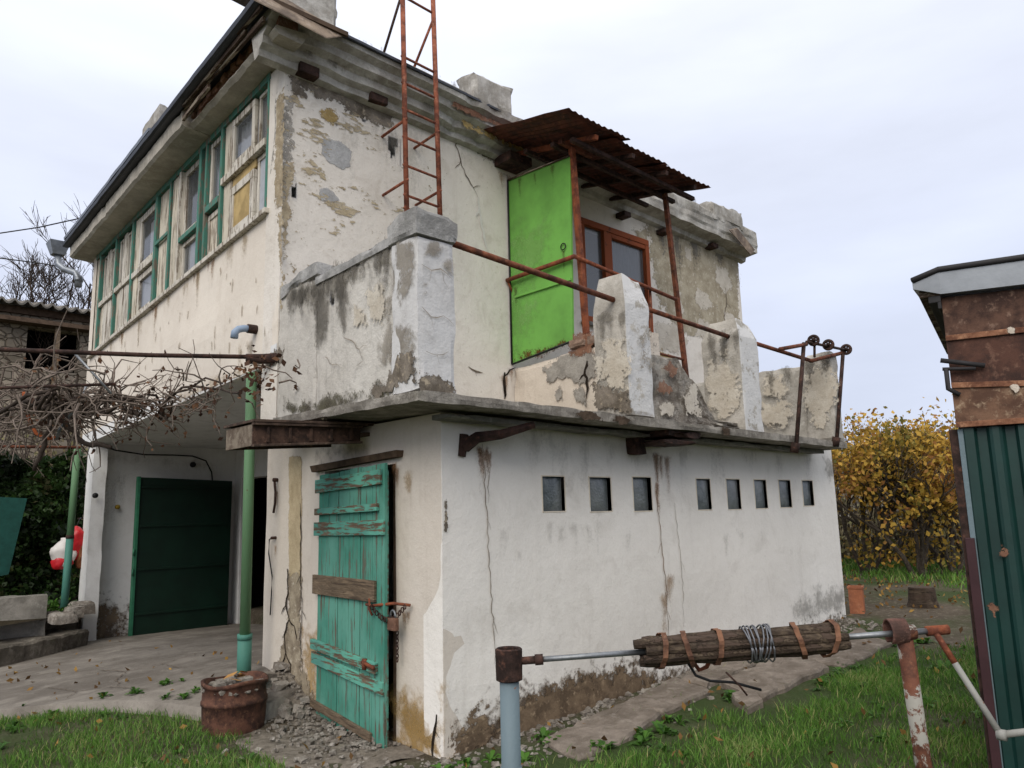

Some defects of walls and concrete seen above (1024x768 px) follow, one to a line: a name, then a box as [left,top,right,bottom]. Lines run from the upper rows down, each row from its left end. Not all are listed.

spalling [267,75,404,309]
damp [287,246,392,347]
spalling [371,241,456,399]
crack [579,361,589,398]
spalling [542,331,633,425]
peeling [633,224,740,417]
peeling [761,363,839,429]
crack [281,508,306,673]
spalling [278,456,314,699]
crack [482,445,497,668]
crack [656,460,685,634]
damp [390,693,438,755]